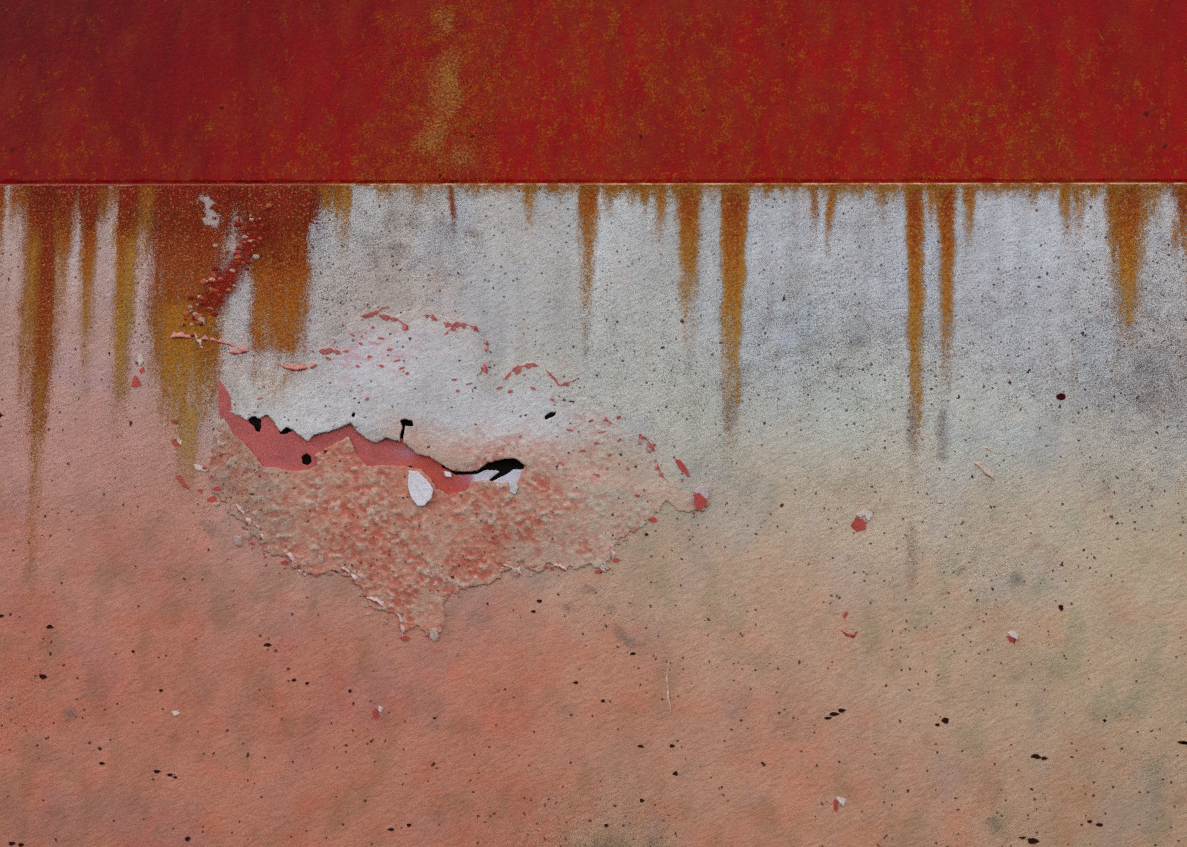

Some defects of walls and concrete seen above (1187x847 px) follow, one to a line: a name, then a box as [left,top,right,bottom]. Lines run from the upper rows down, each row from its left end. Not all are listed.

rust [418,53,471,164]
rust [0,185,352,562]
rust [366,184,1187,450]